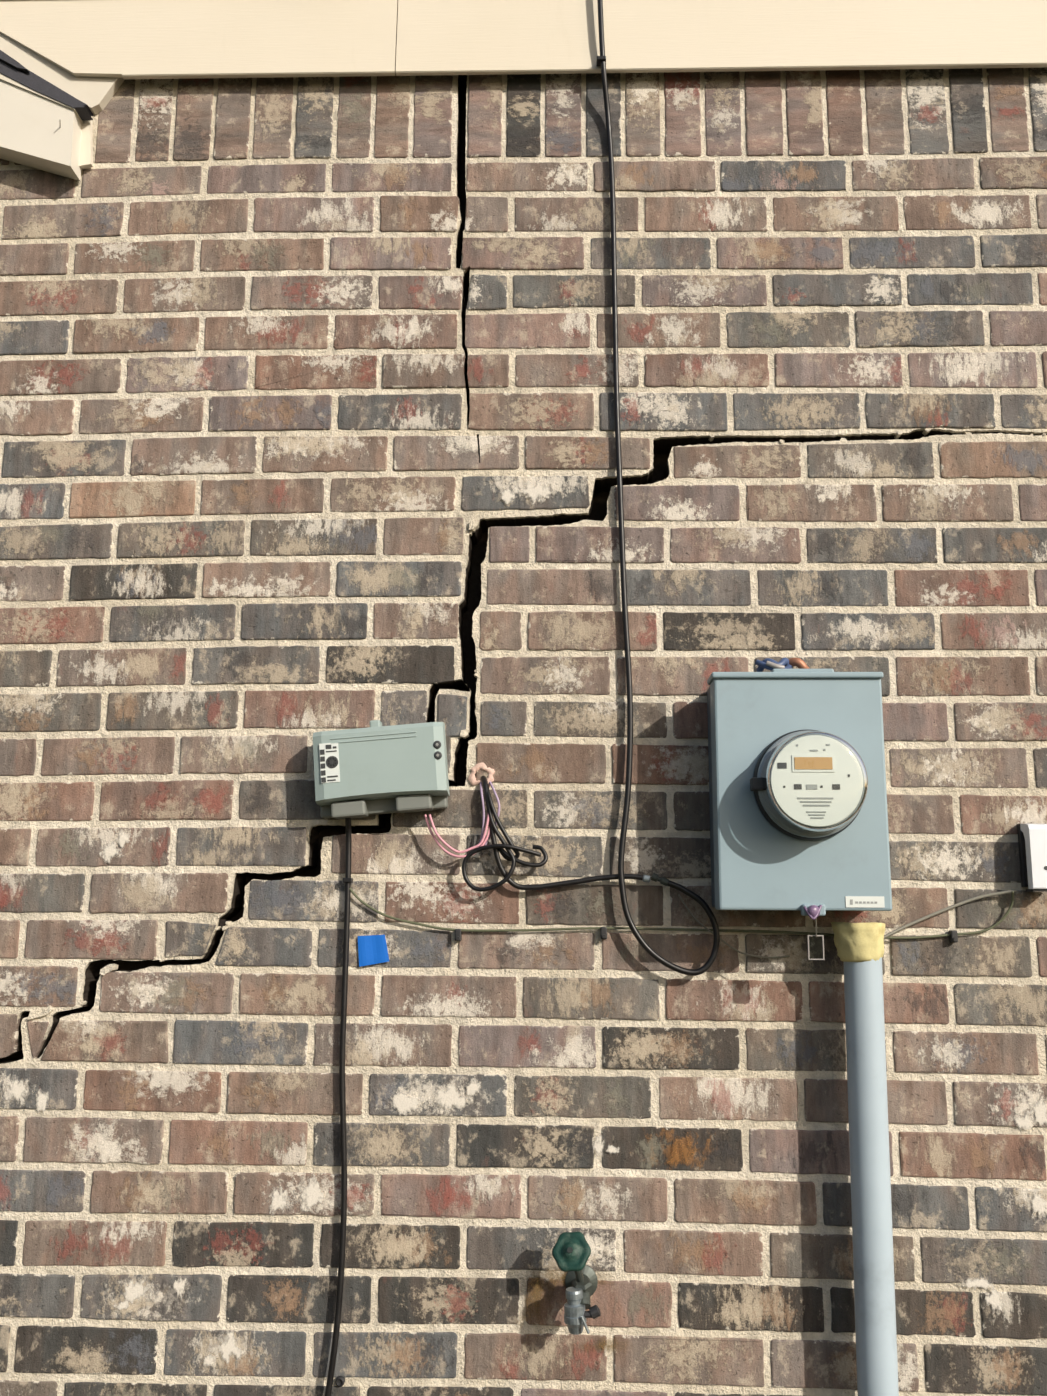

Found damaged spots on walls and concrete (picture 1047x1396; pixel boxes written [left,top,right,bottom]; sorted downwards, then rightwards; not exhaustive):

crack [456,75,480,463]
crack [427,428,1047,787]
crack [0,813,392,1063]